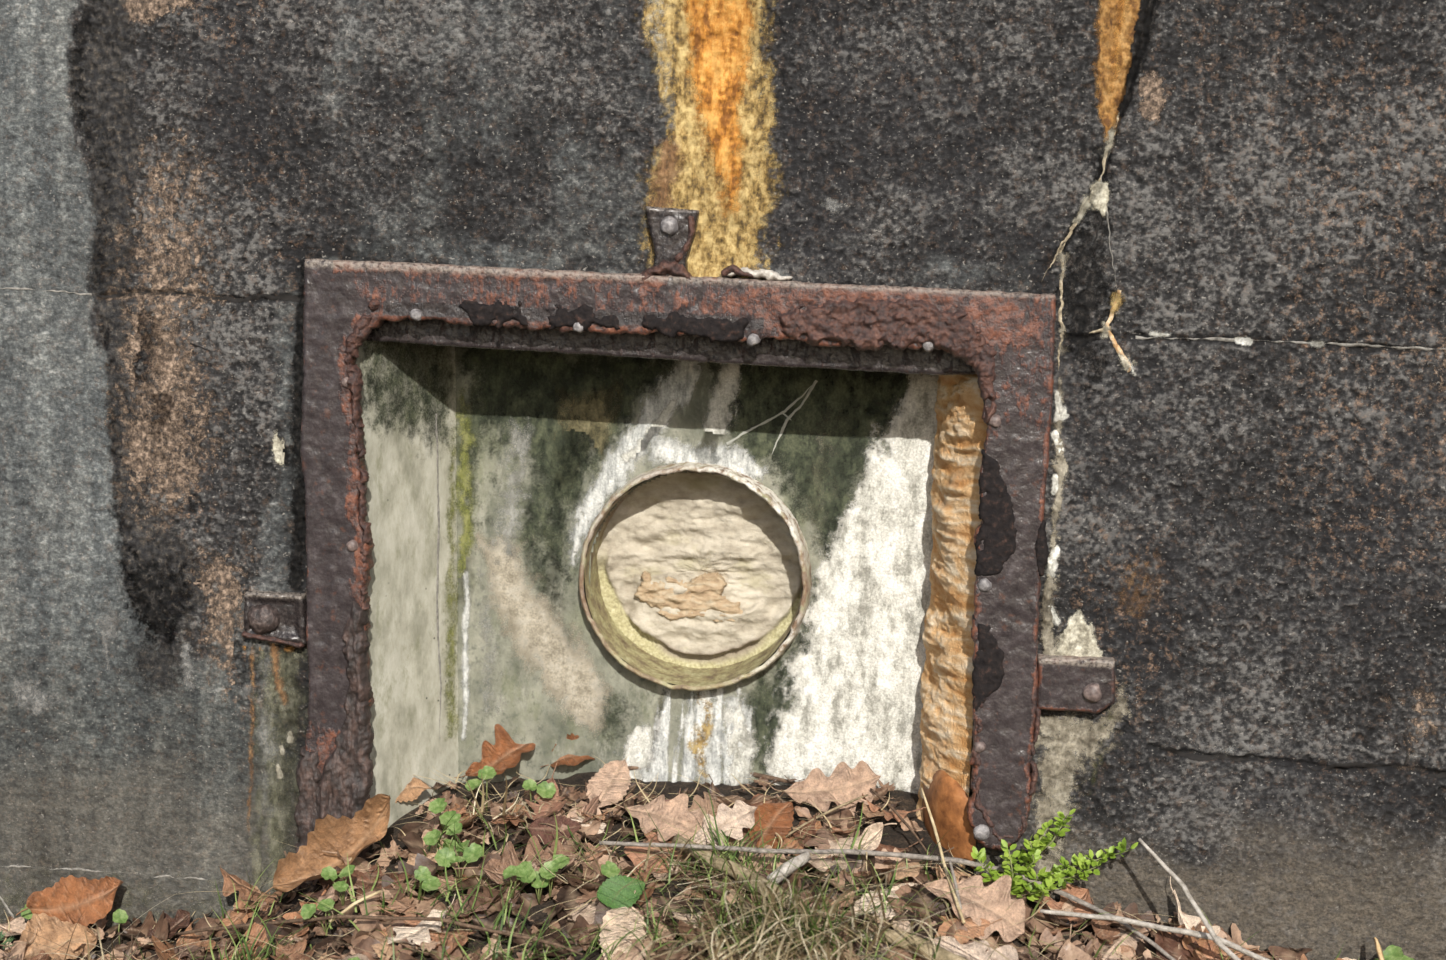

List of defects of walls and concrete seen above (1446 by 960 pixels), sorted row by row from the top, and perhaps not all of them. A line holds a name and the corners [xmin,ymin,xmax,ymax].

water stain [67,0,204,693]
water stain [287,264,306,591]
rust [294,299,380,854]
water stain [360,341,939,794]
rust [641,0,782,280]
rust [778,298,997,424]
rust [1094,0,1161,139]
crack [1041,115,1446,400]
rust [971,703,1041,842]